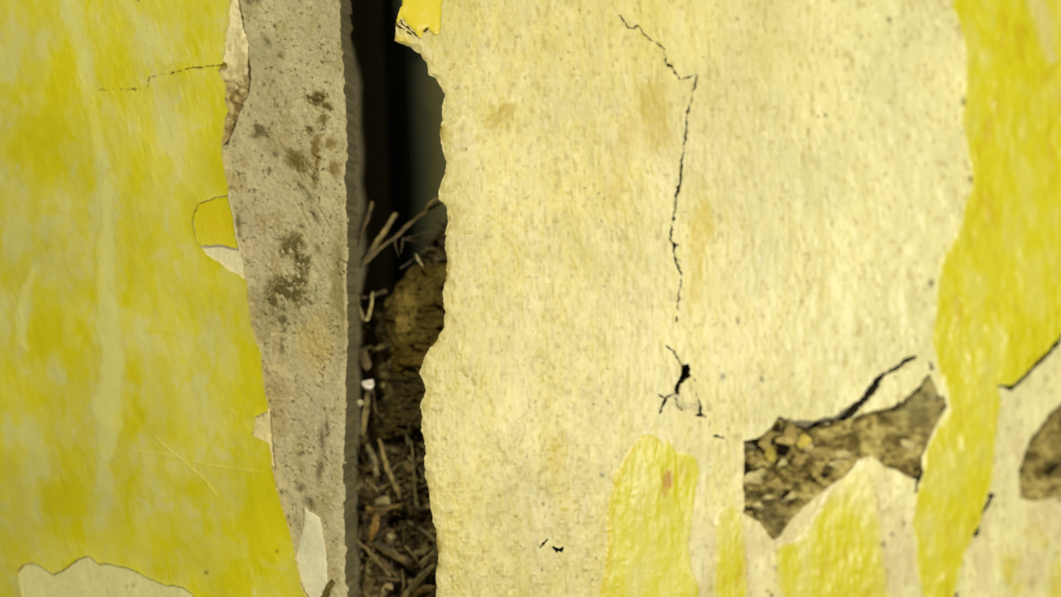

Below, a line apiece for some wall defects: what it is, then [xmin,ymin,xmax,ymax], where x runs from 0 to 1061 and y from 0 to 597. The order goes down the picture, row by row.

crack [100,62,227,91]
peeling [395,0,444,47]
leakage [277,84,345,197]
spalling [193,0,361,597]
peeling [598,0,1061,597]
peeling [18,556,195,597]